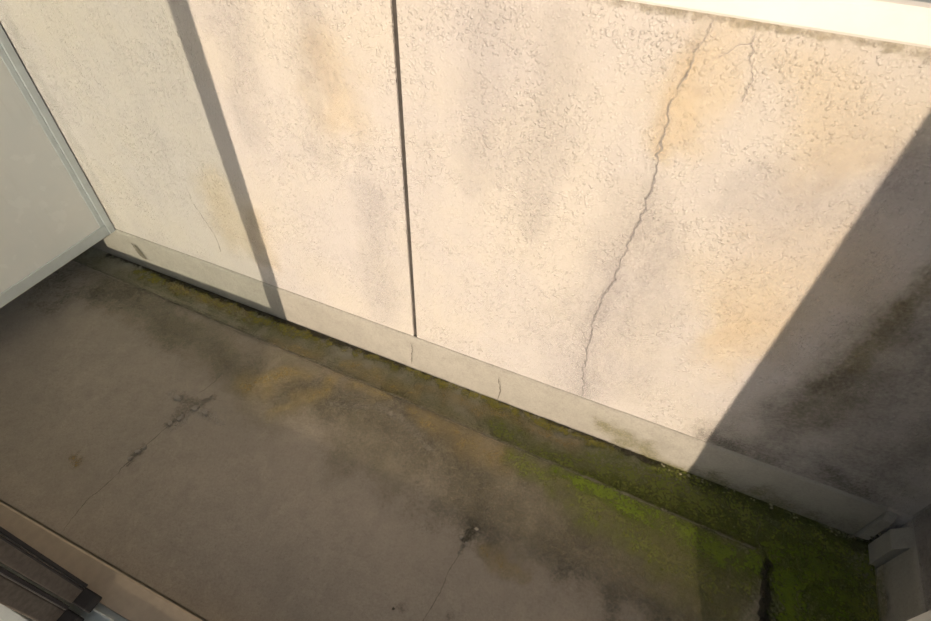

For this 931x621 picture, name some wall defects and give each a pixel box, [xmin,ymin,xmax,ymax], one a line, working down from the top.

crack [581,22,713,397]
crack [64,395,212,529]
crack [423,517,479,621]